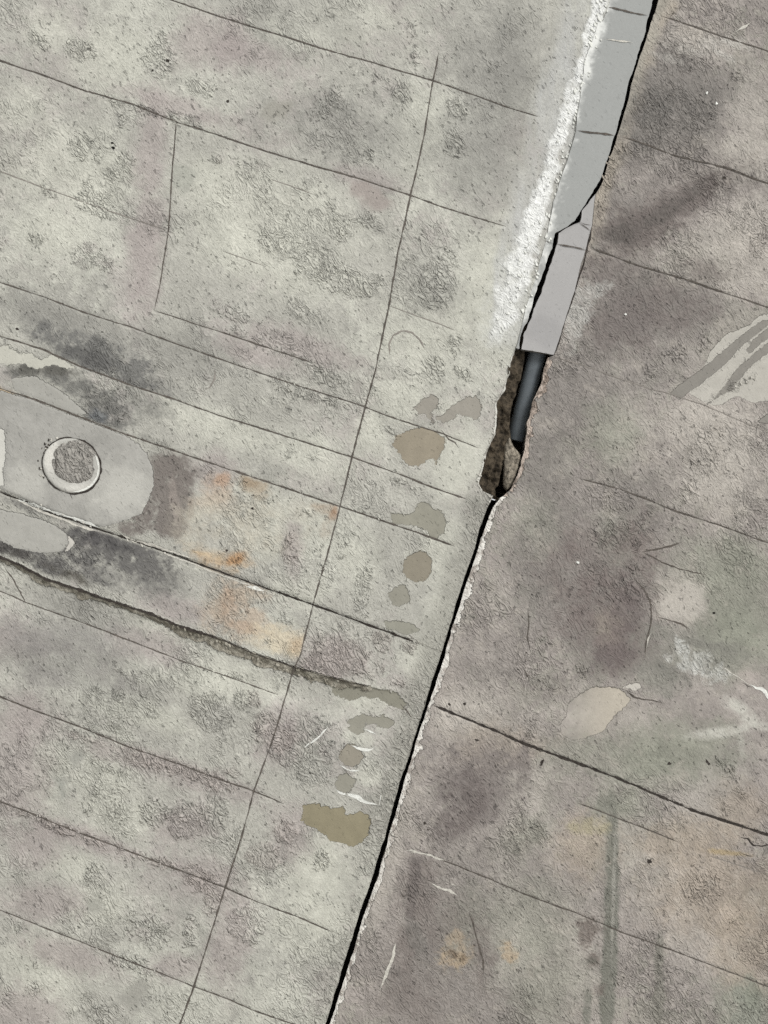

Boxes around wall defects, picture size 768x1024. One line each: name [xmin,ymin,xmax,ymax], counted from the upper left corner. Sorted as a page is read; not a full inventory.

damp [0,307,223,612]
crack [388,330,425,354]
damp [472,0,610,359]
crack [528,0,658,353]
peeling [0,500,449,980]
crack [0,492,768,1024]
spalling [330,333,554,1024]